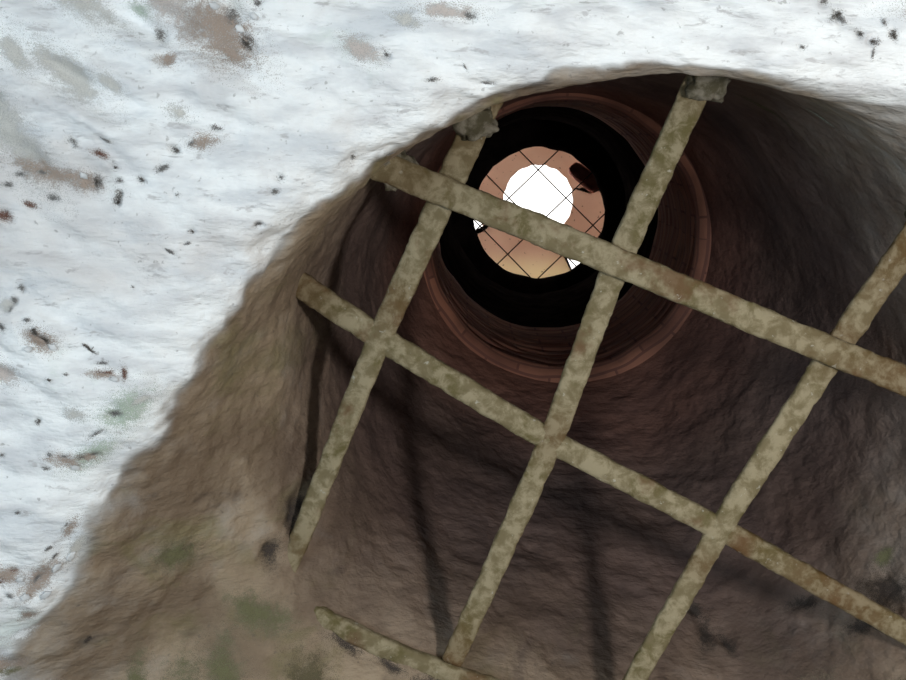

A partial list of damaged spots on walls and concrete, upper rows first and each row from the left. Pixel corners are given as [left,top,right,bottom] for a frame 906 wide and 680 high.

leakage [848,540,906,613]